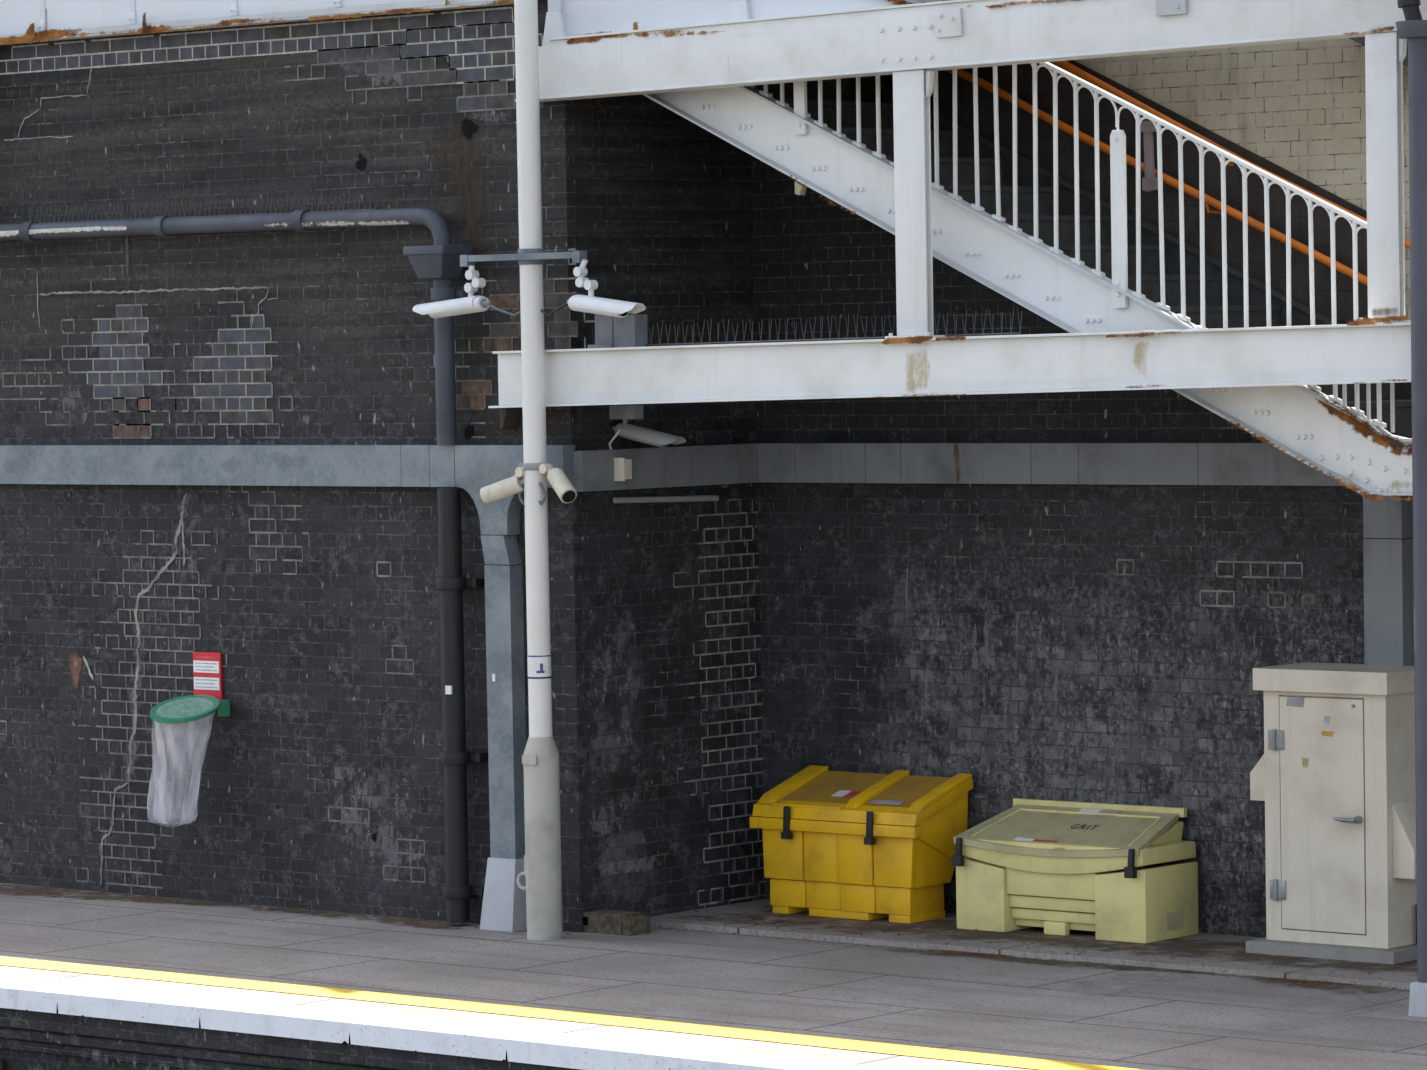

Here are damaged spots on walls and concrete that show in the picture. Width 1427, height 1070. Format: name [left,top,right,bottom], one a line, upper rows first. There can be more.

rust [0,9,280,45]
rust [307,0,464,21]
rust [1317,393,1412,455]
rust [1227,420,1413,501]
crack [100,493,191,884]